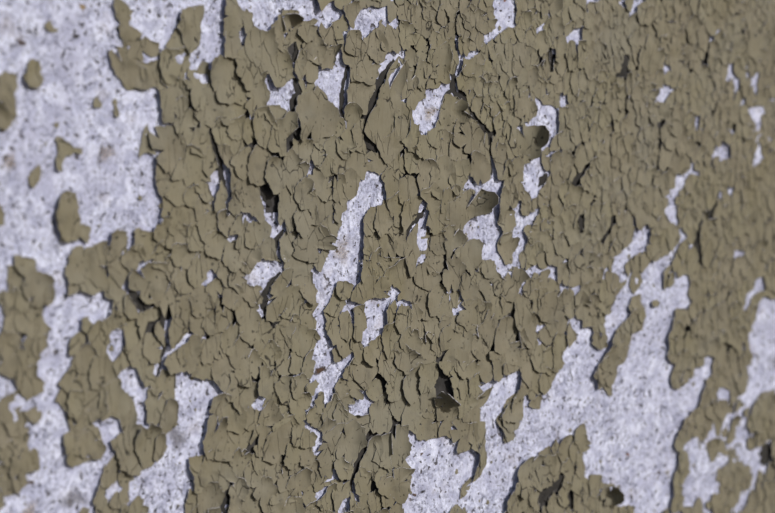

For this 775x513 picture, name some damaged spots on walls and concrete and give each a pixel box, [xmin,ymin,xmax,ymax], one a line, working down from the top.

crack [288,43,302,141]
crack [339,59,395,152]
crack [444,41,493,176]
crack [209,132,227,190]
crack [538,173,548,187]
peeling [442,0,746,308]
crack [128,290,167,376]
crack [260,229,284,325]
flaking render [449,289,466,316]
crack [342,429,370,499]
crack [538,475,573,511]
crack [758,443,775,480]